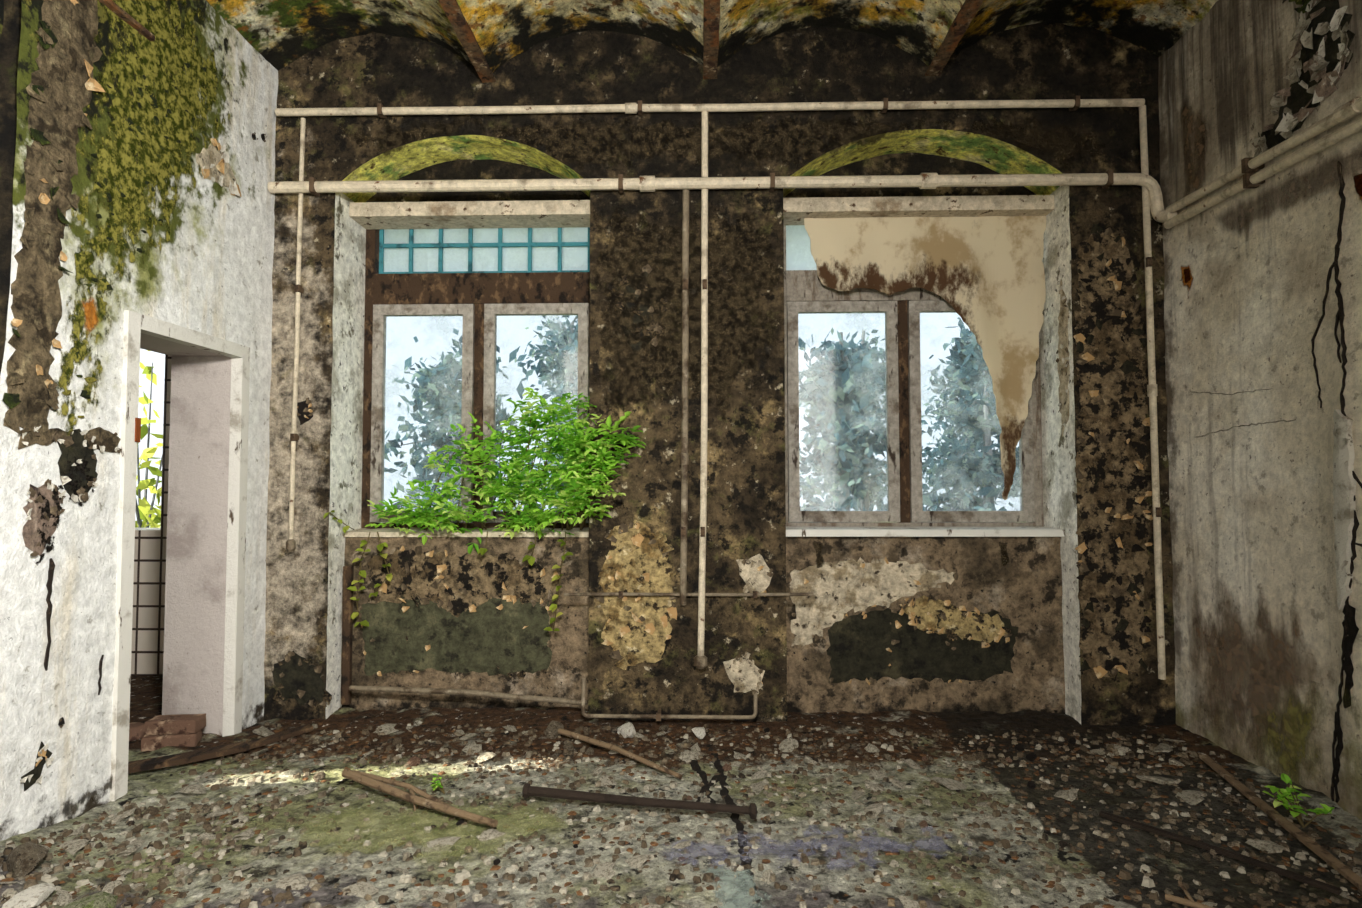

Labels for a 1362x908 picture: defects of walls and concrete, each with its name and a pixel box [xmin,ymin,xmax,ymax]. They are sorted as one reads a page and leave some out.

flaking render [1252,0,1355,157]
rust [1354,174,1362,200]
flaking render [3,0,122,565]
peeling [736,554,774,600]
peeling [789,557,1018,685]
leakage [1193,584,1314,760]